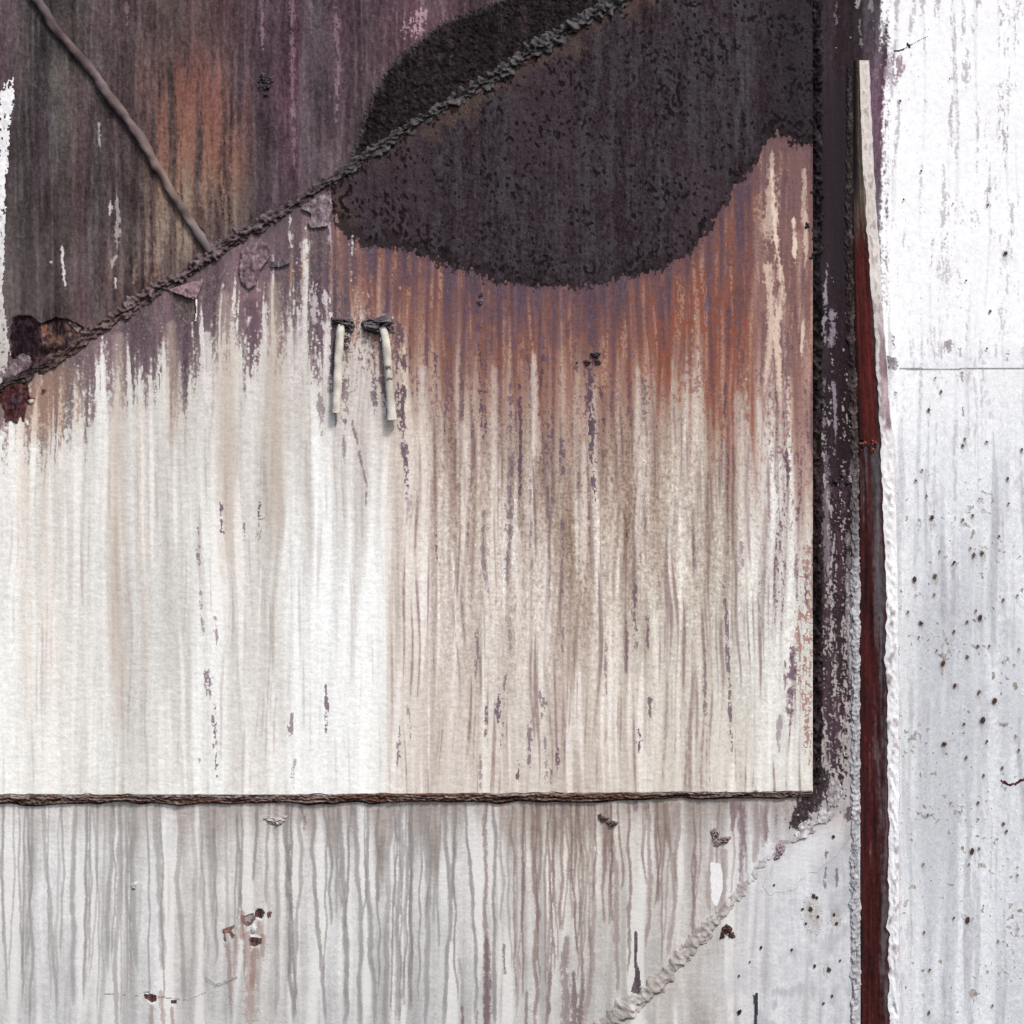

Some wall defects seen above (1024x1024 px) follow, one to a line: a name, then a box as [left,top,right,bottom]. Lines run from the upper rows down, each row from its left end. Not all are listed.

peeling [0,353,32,379]
water stain [104,331,152,749]
water stain [161,289,243,587]
water stain [260,215,330,564]
rust [0,0,851,882]
water stain [457,364,525,703]
water stain [529,353,543,473]
water stain [631,366,646,590]
water stain [729,149,810,628]
peeling [222,909,272,1024]
water stain [0,800,771,1024]
rust [824,849,839,889]